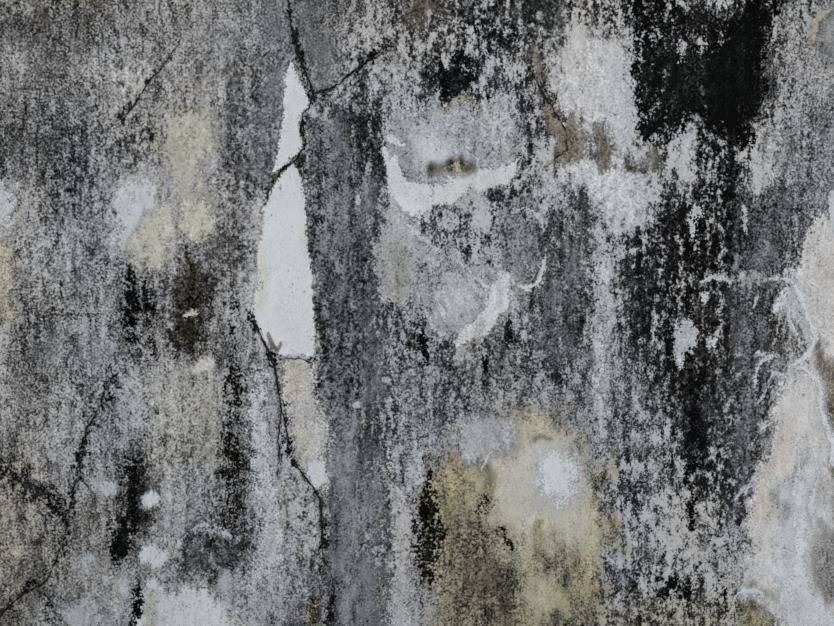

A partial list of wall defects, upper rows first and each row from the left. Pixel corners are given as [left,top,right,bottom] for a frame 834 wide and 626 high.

crack [117,48,176,124]
crack [263,0,394,207]
crack [0,364,121,626]
spalling [245,60,332,588]
crack [245,309,337,626]
water stain [449,413,521,471]
water stain [504,320,513,349]
water stain [522,0,834,626]